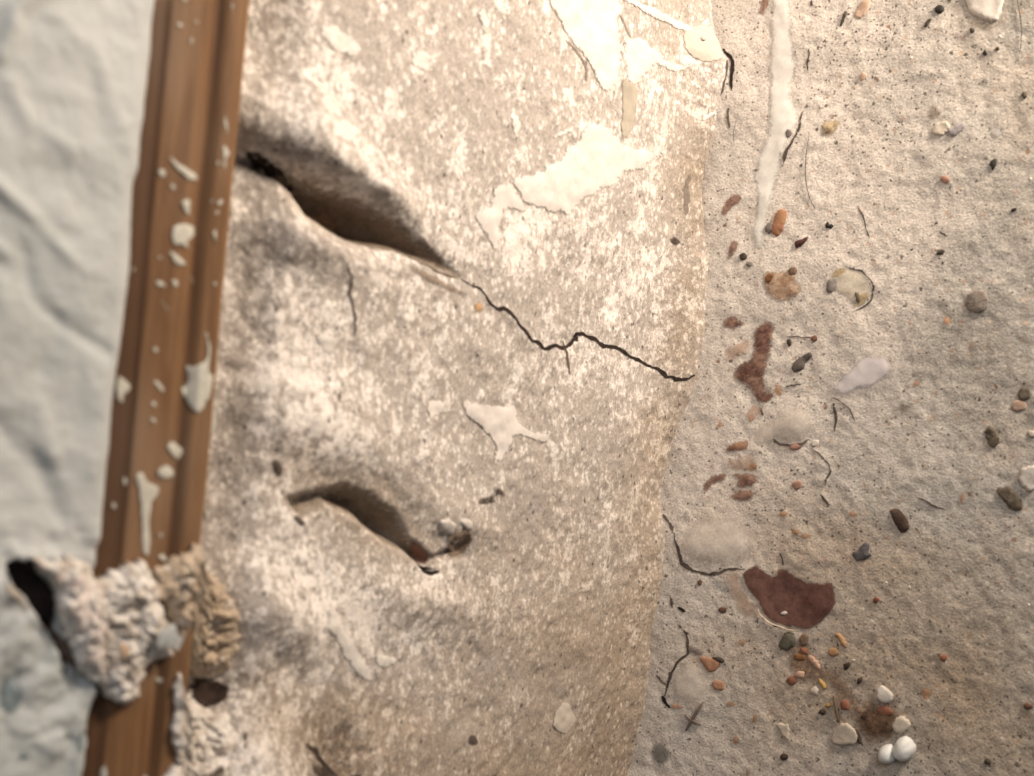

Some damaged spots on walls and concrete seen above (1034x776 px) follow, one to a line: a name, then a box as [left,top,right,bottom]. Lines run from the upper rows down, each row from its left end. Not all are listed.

peeling [475,0,723,249]
crack [347,263,357,334]
crack [403,254,695,382]
flaking render [4,543,242,706]